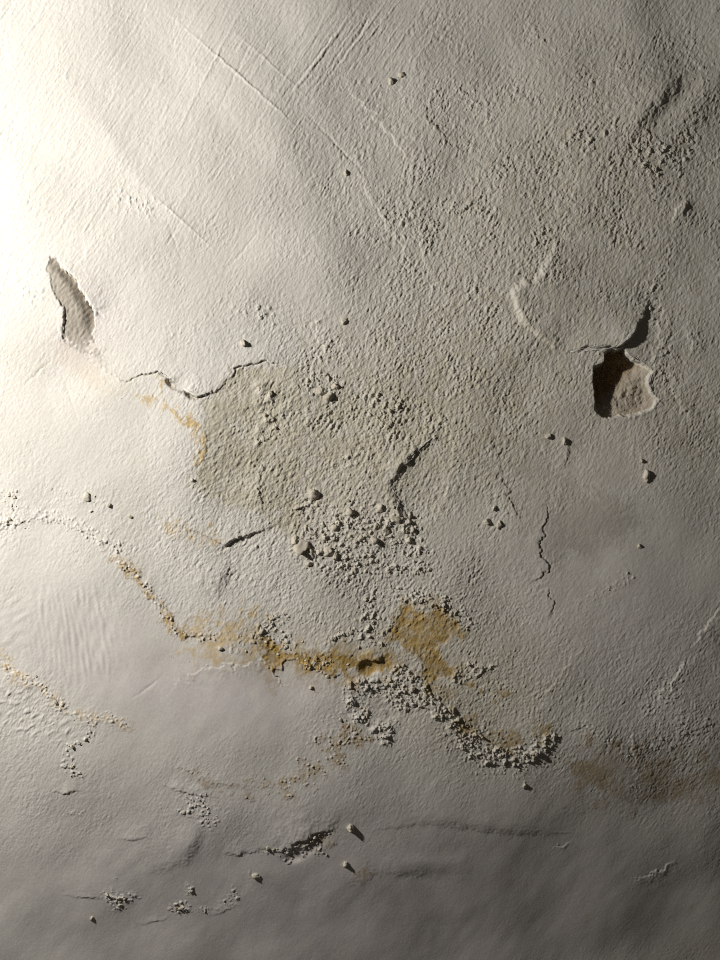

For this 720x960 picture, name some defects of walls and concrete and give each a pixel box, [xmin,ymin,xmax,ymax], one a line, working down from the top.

peeling [44,254,115,377]
crack [117,360,283,402]
spalling [591,296,677,420]
crack [210,524,279,557]
spalling [189,351,510,691]
crack [531,442,571,620]
rust [104,552,558,765]
spalling [334,664,559,772]
spalling [223,828,339,865]